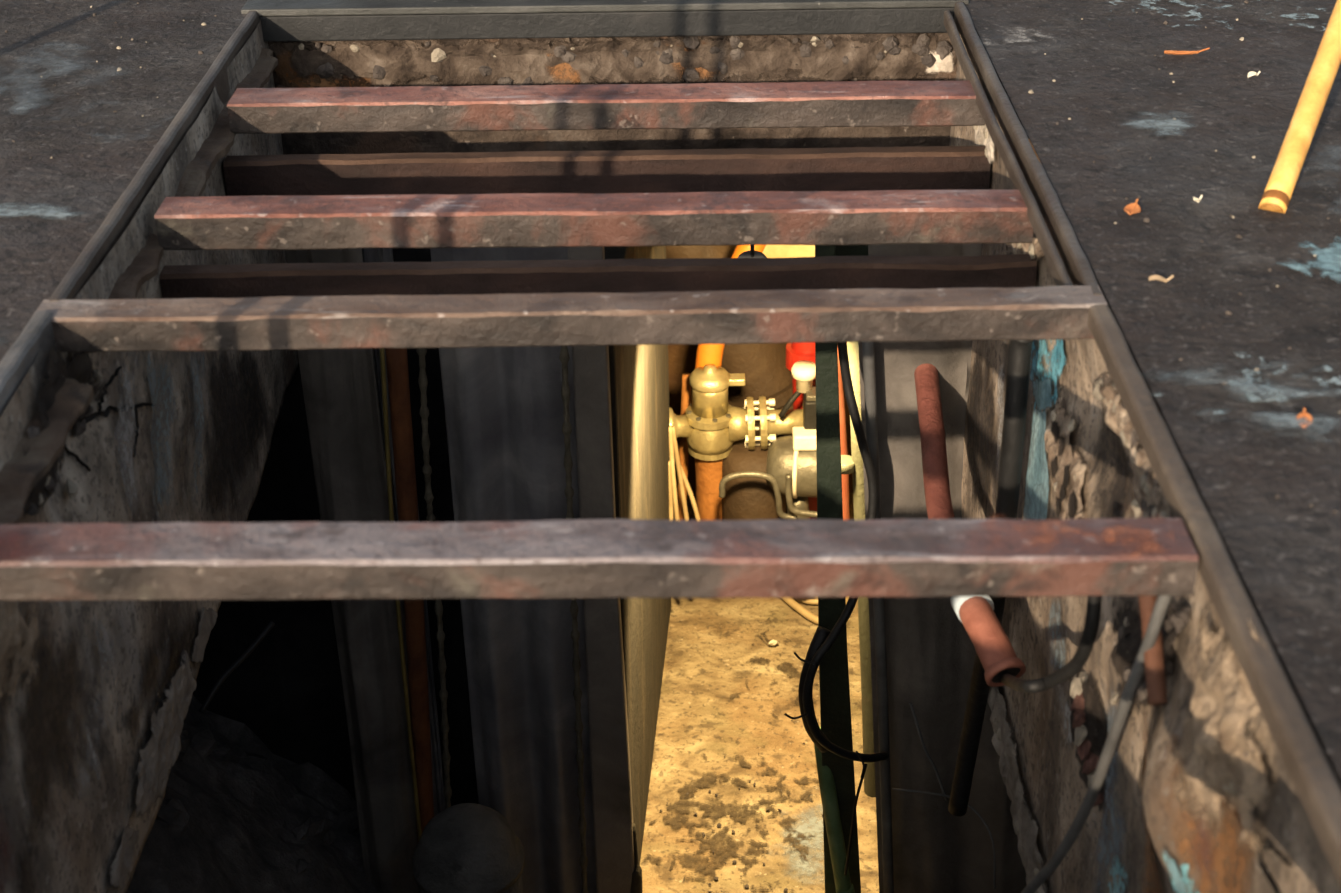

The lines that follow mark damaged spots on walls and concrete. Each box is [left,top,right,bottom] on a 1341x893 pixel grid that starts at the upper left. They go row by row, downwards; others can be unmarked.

spalling [23,341,107,517]
crack [64,366,155,472]
spalling [1044,396,1087,519]
spalling [1092,368,1175,518]
spalling [110,607,218,889]